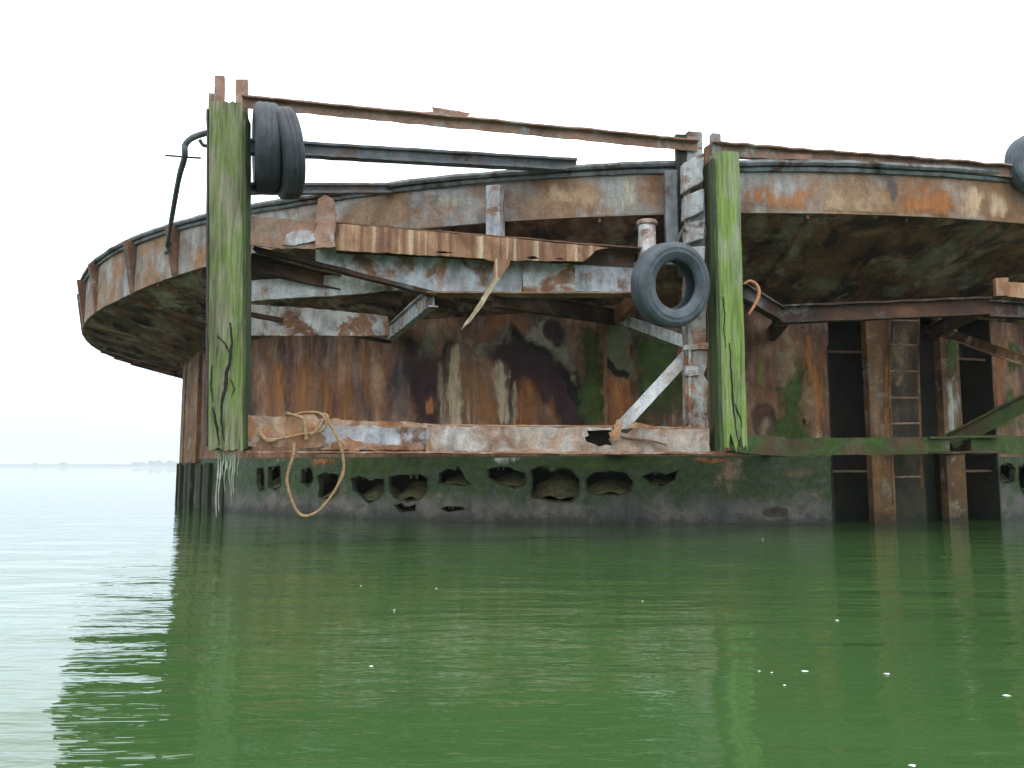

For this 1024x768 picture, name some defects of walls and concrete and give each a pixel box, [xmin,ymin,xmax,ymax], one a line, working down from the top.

rust [746,189,809,211]
rust [823,174,1007,218]
crack [210,322,235,445]
rust [267,357,351,420]
rust [404,338,458,424]
rust [463,330,585,425]
damp [577,328,604,425]
rust [607,376,634,420]
crack [723,297,742,443]
rust [872,326,909,438]